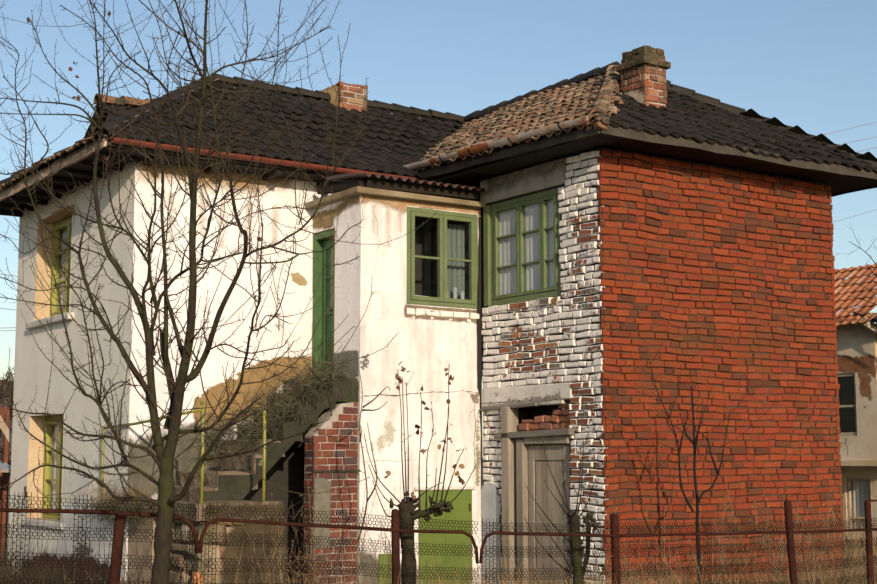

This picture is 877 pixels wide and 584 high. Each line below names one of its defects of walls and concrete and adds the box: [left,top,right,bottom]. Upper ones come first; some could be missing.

peeling [291,272,307,286]
peeling [499,213,600,377]
peeling [482,375,604,504]
peeling [837,354,877,407]